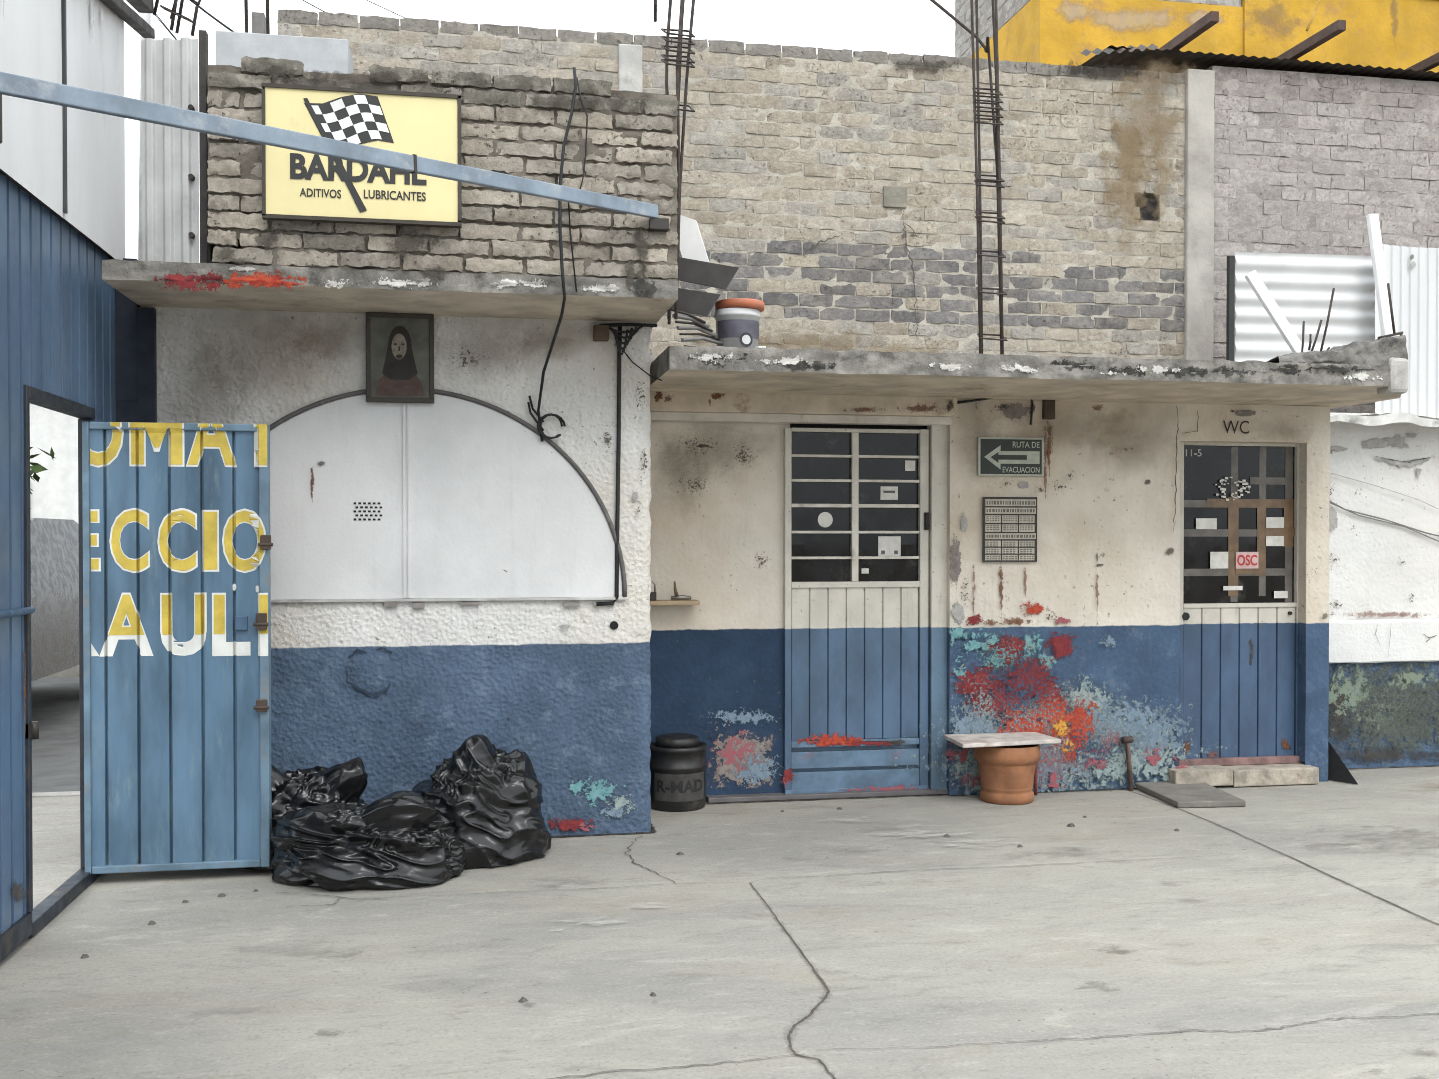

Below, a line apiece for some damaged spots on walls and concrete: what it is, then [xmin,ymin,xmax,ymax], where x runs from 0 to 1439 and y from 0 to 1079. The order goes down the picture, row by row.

crack [283,824,690,907]
flaking render [700,707,798,792]
crack [550,788,1439,1079]
peeling [799,493,1236,796]